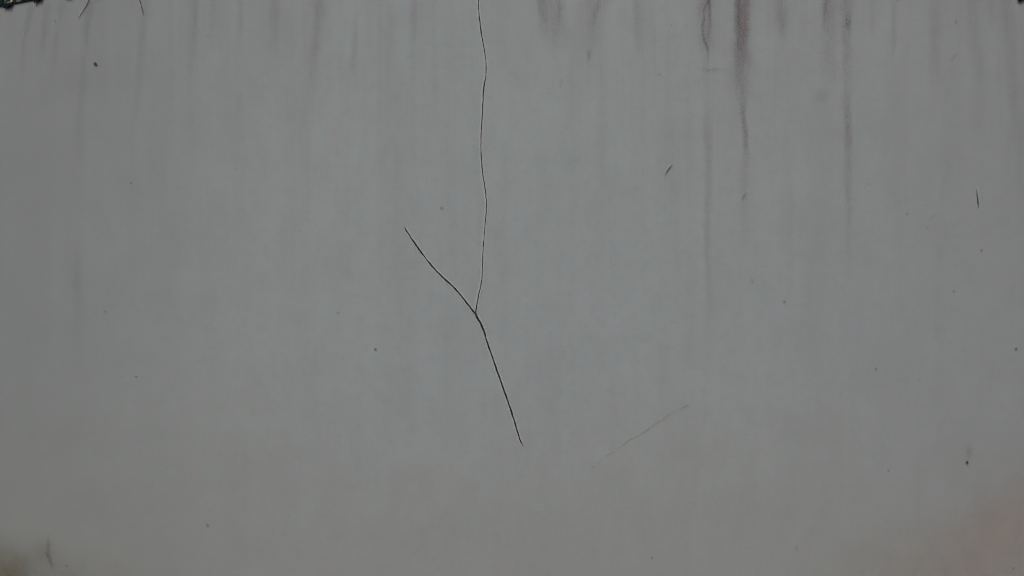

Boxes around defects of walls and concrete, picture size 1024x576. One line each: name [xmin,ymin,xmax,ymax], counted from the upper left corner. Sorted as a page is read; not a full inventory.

crack [405,0,522,444]